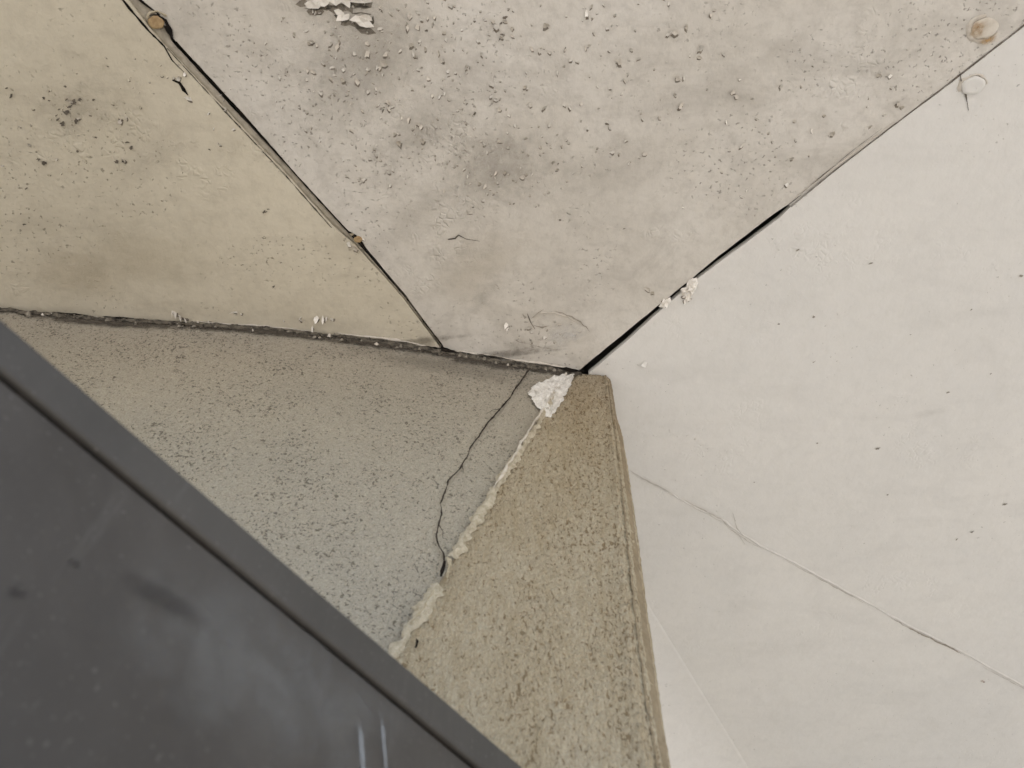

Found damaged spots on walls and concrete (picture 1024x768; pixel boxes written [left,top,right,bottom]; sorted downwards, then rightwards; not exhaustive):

peeling [250,0,583,218]
peeling [530,4,618,78]
peeling [644,278,698,308]
spalling [448,373,574,561]
crack [435,309,589,560]
spalling [388,583,444,659]
crack [628,470,1024,688]